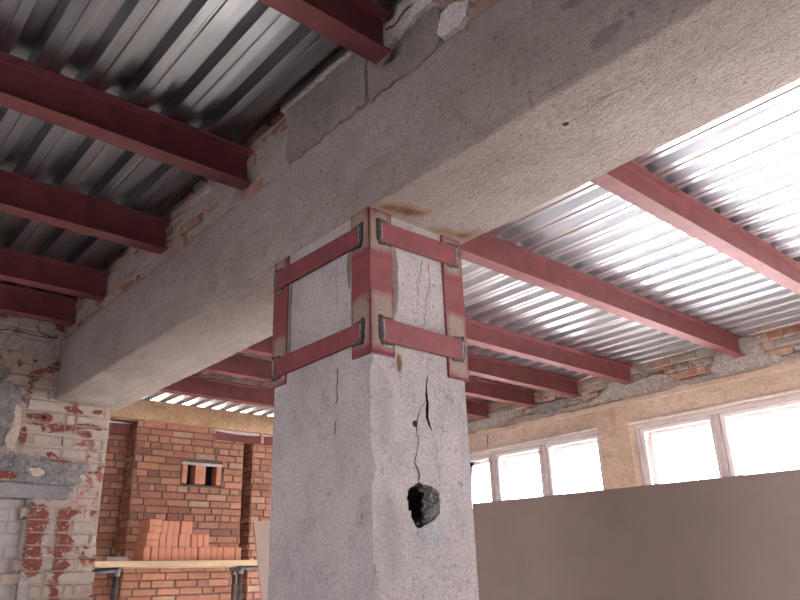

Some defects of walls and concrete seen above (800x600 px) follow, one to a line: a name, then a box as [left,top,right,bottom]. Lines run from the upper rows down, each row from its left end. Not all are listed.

peeling [367,7,445,103]
rust [370,196,494,245]
crack [416,258,430,329]
rust [393,349,406,378]
peeling [5,359,102,449]
crack [412,359,440,483]
peeling [0,470,17,481]
flaking render [29,468,45,477]
peeling [47,452,72,464]
spalling [407,482,441,528]
peeling [22,502,90,600]